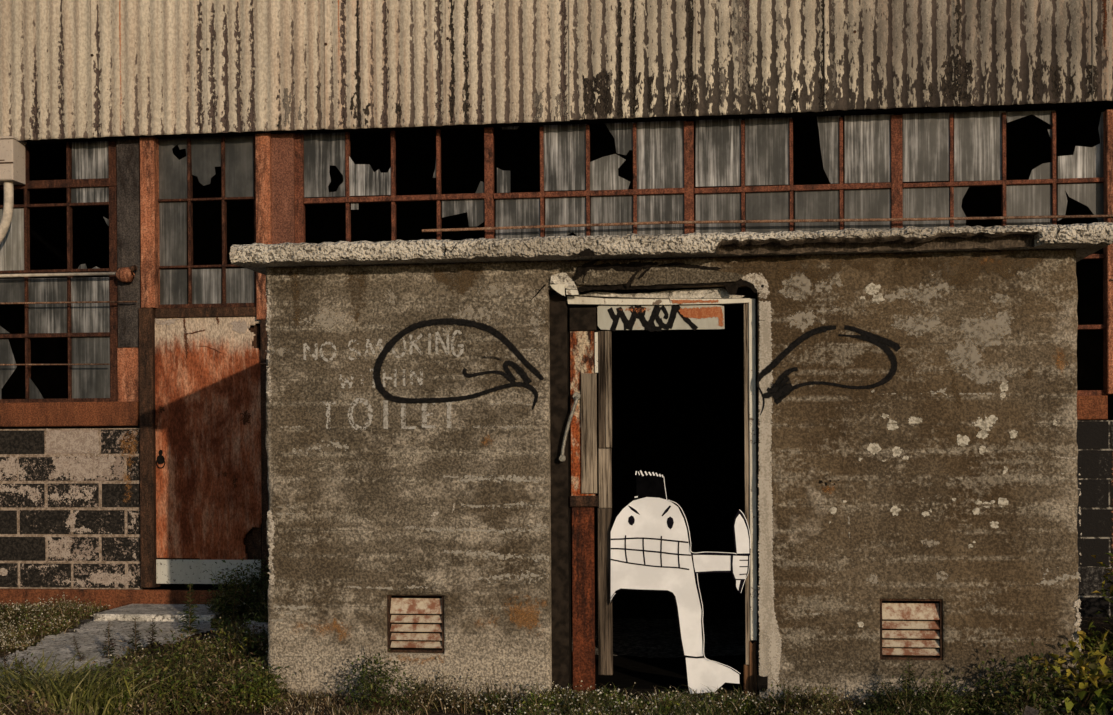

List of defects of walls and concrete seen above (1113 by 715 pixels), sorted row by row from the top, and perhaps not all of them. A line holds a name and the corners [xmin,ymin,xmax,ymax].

spalling [716,228,1038,255]
rust [183,317,221,359]
peeling [0,428,138,587]
peeling [550,248,788,700]